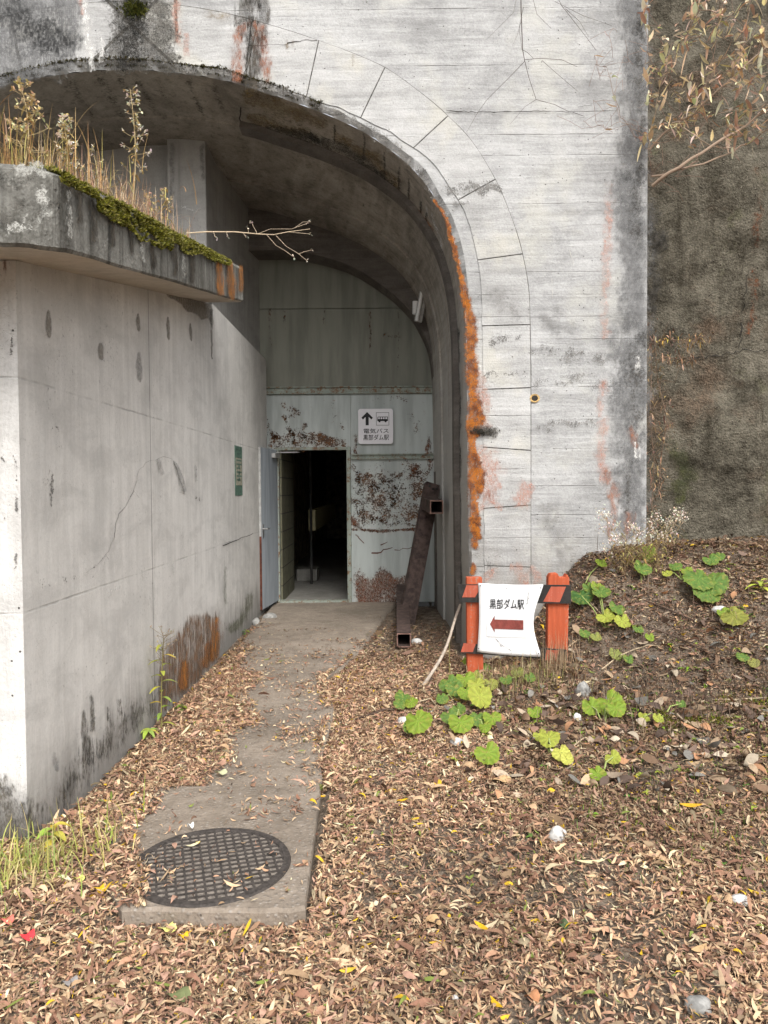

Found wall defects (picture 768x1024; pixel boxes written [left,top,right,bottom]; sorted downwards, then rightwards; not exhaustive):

leakage [0,0,192,117]
corrosion [233,25,272,81]
crack [448,105,589,116]
corrosion [217,263,244,300]
leakage [610,0,668,538]
corrosion [433,199,499,550]
crack [90,456,186,570]
corrosion [351,515,415,533]
corrosion [352,567,406,606]
corrosion [158,613,222,709]
leakage [57,694,155,810]